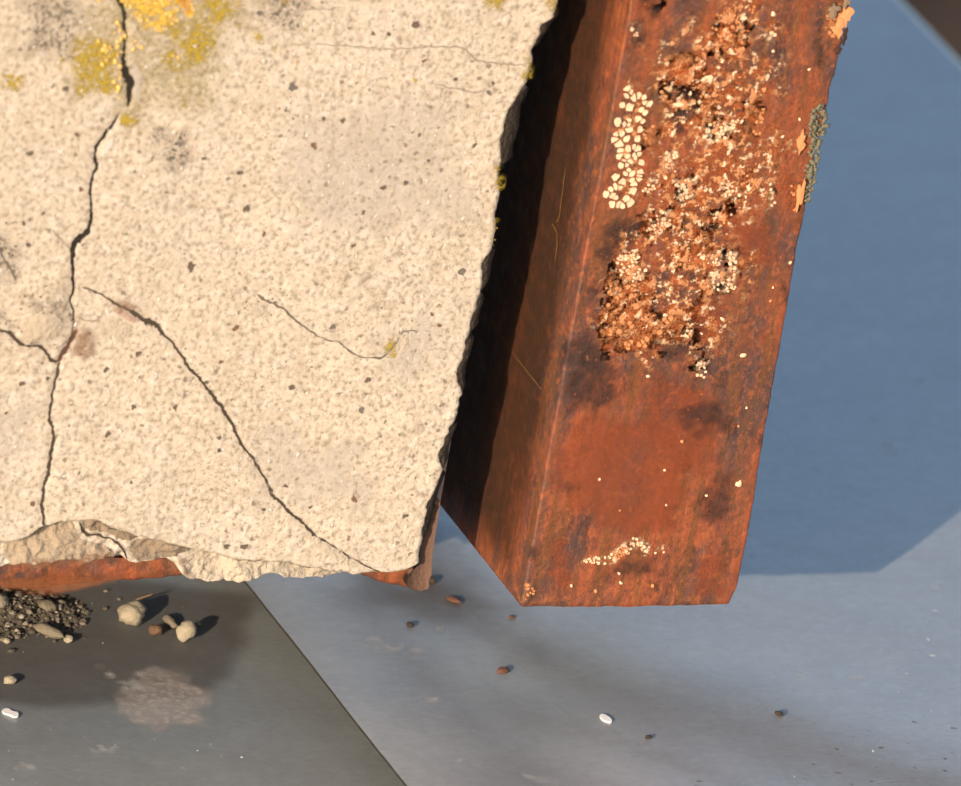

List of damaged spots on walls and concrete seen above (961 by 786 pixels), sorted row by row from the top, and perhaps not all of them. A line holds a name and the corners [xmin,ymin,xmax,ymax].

rust [828,0,854,55]
rust [796,129,806,155]
rust [591,14,771,365]
rust [781,175,806,232]
crack [0,0,381,573]
crack [257,294,416,360]
spalling [3,510,347,582]
rust [0,578,99,591]